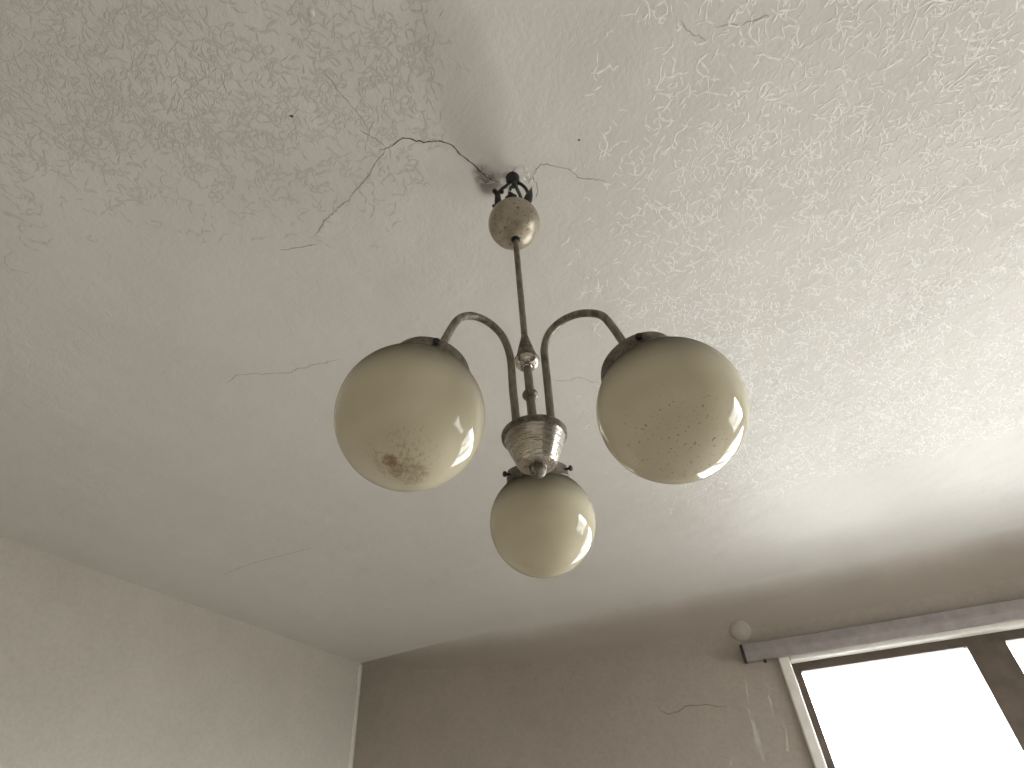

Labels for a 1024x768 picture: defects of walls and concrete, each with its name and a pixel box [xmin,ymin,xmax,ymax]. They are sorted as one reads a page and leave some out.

crack [681,15,769,41]
crack [280,66,497,251]
crack [532,163,607,197]